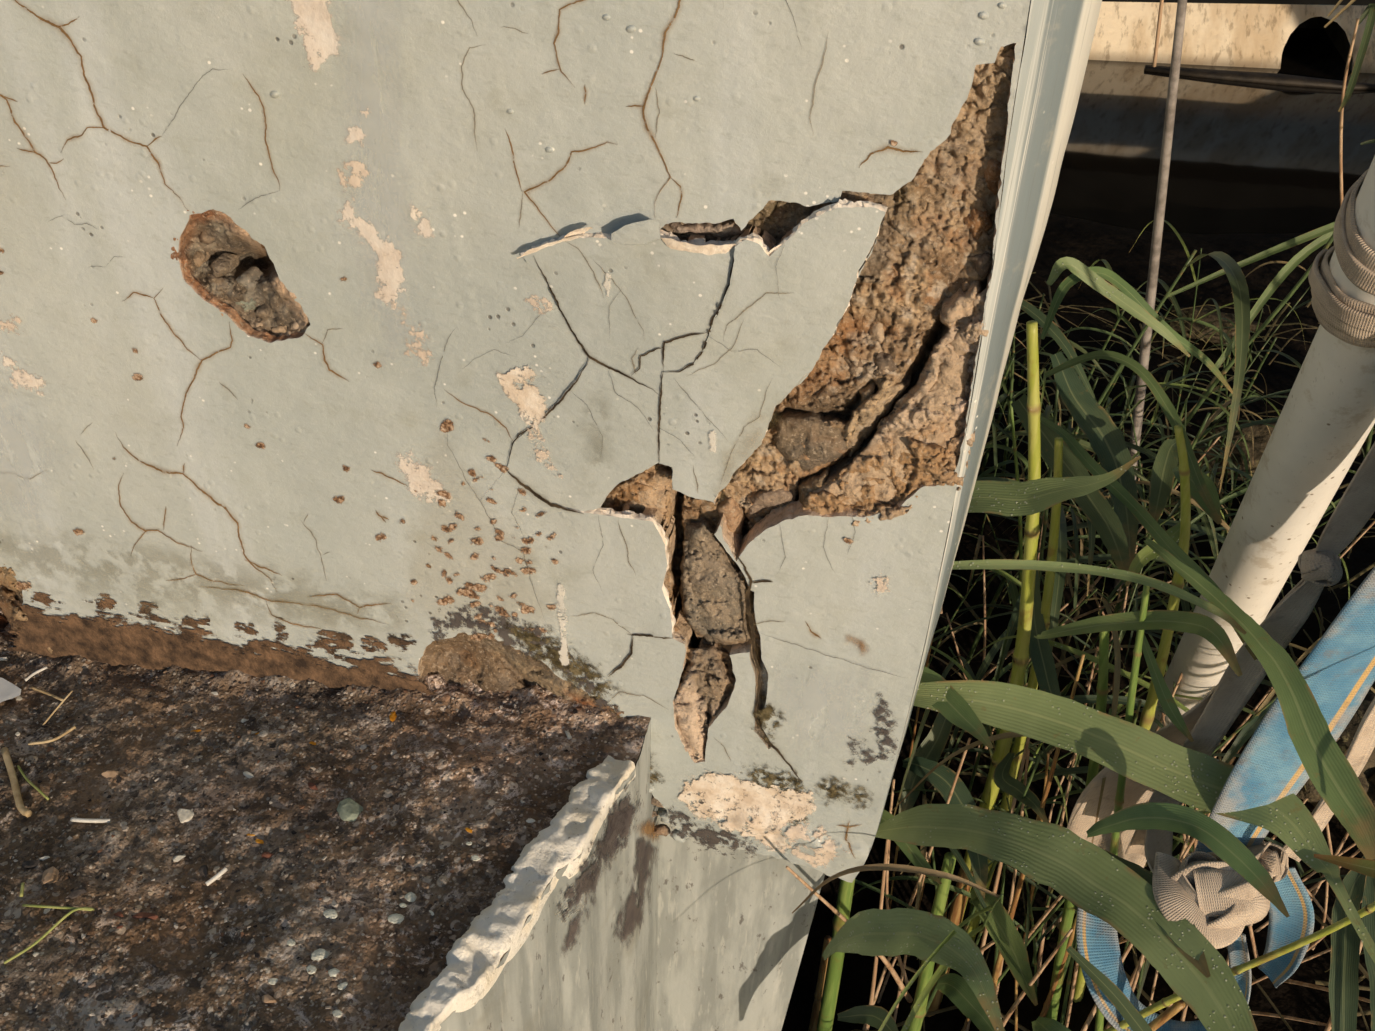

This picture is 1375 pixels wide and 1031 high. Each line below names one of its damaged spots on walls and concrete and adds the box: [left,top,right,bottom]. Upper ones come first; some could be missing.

crack [0,0,280,228]
peeling [286,0,344,72]
peeling [336,108,434,366]
crack [434,0,787,664]
crack [786,1,827,127]
crack [859,146,920,167]
crack [81,292,389,629]
spalling [596,37,1026,868]
leakage [430,605,620,718]
crack [578,613,671,706]
crack [736,534,893,780]